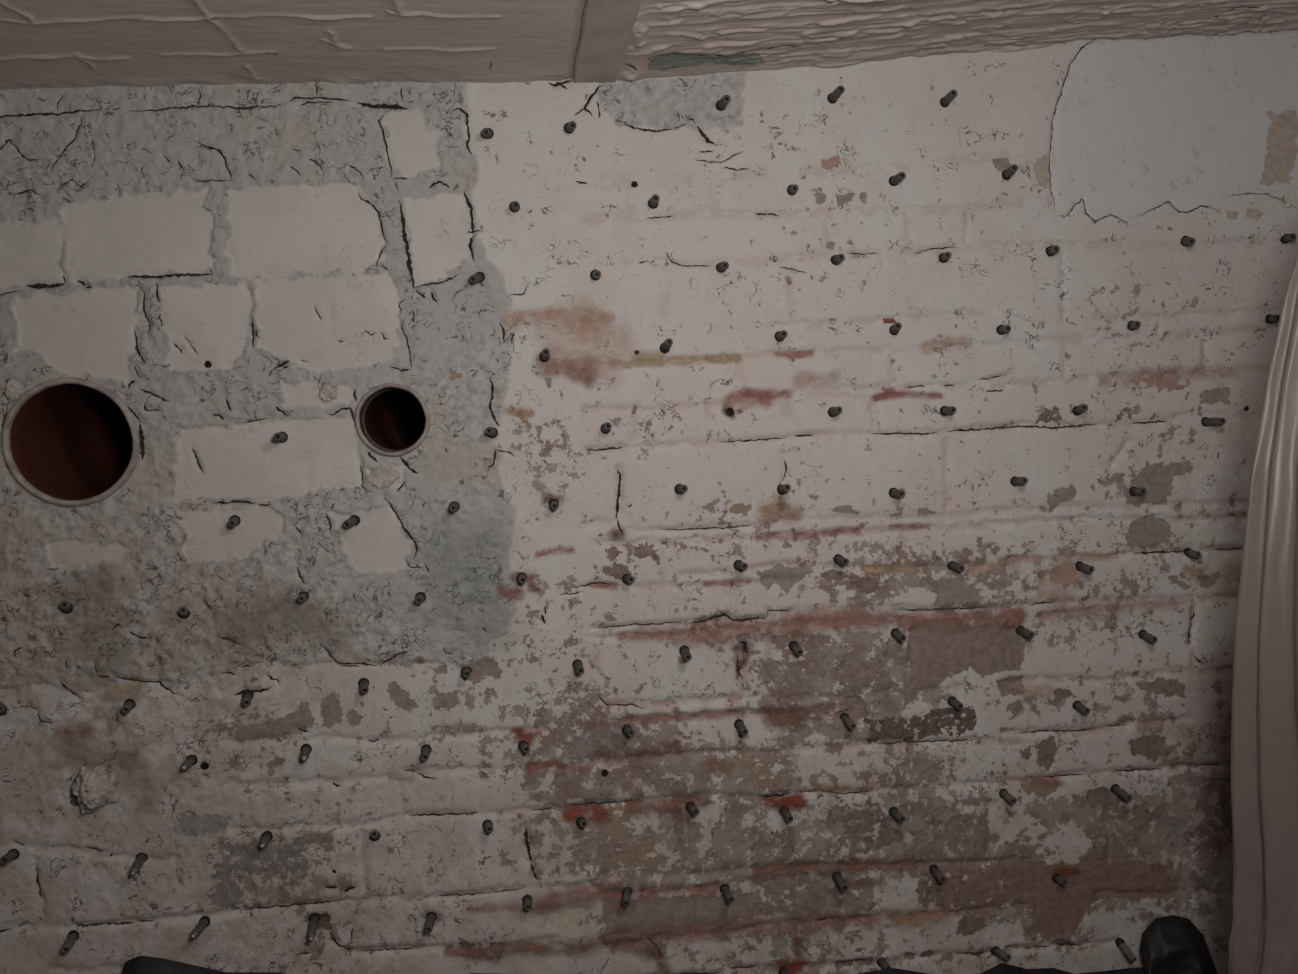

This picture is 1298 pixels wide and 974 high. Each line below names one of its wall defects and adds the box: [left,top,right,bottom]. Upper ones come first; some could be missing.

crack [1048,39,1284,227]
crack [0,81,481,371]
crack [126,273,210,461]
crack [212,398,288,423]
crack [360,451,429,571]
crack [587,446,632,534]
peeling [602,542,661,580]
peeling [756,564,887,594]
peeling [1125,458,1194,549]
flaking render [703,619,1025,794]
peeling [1128,676,1187,763]
flaking render [832,757,1174,940]